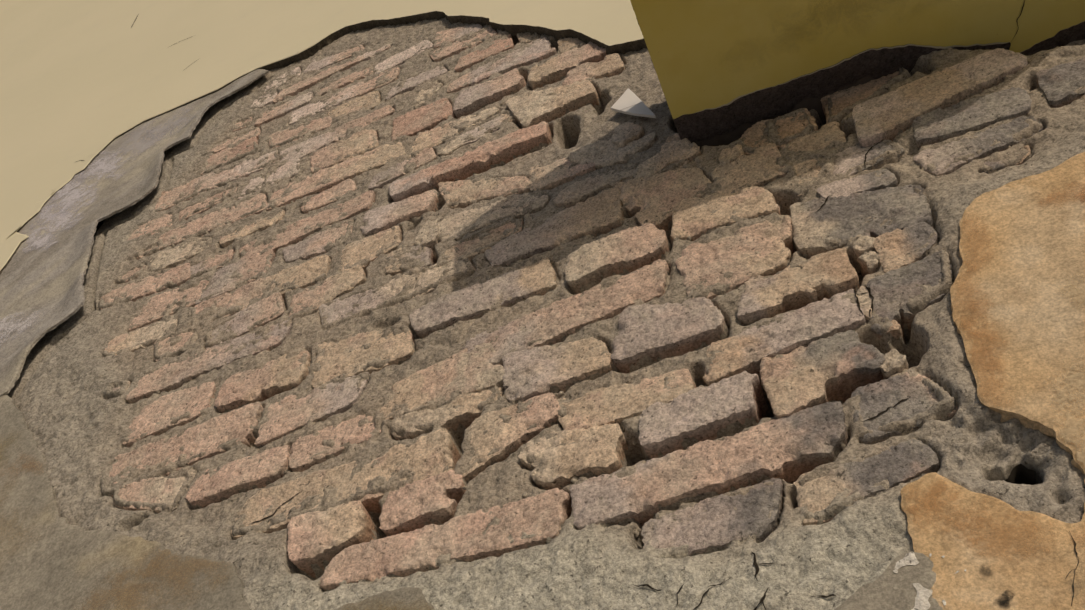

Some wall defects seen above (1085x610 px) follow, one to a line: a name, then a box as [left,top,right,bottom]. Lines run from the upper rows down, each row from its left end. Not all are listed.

spalling [953,42,1010,51]
spalling [1021,21,1085,56]
spalling [673,46,942,142]
peeling [0,32,332,271]
spalling [502,313,621,402]
spalling [463,342,776,490]
spalling [287,468,415,540]
spalling [379,423,484,537]
spalling [454,443,547,517]
spalling [560,471,597,500]
spalling [653,491,720,519]
spalling [723,480,754,496]